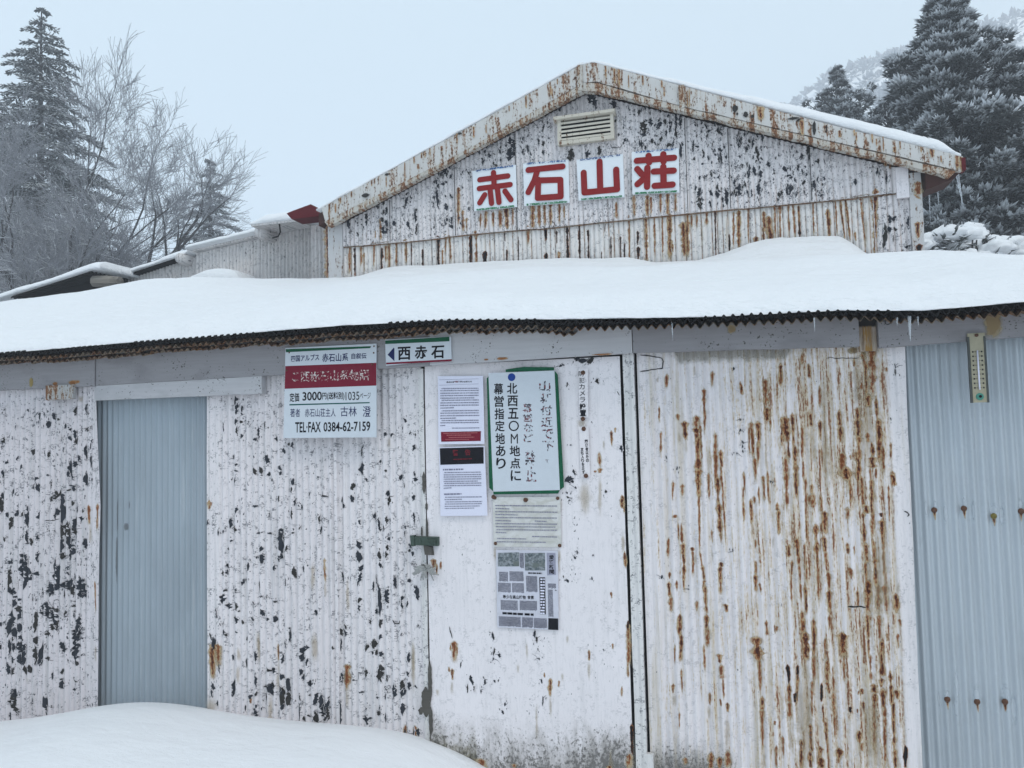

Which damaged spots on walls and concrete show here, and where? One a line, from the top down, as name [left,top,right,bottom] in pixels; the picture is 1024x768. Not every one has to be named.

corrosion [348,219,424,275]
corrosion [436,234,452,265]
corrosion [457,187,879,263]
peeling [587,94,827,208]
peeling [0,404,93,720]
peeling [207,395,326,648]
peeling [232,627,342,724]
peeling [339,445,421,725]
corrosion [666,371,730,712]
corrosion [708,751,731,768]
corrosion [742,354,849,768]
corrosion [837,351,908,768]